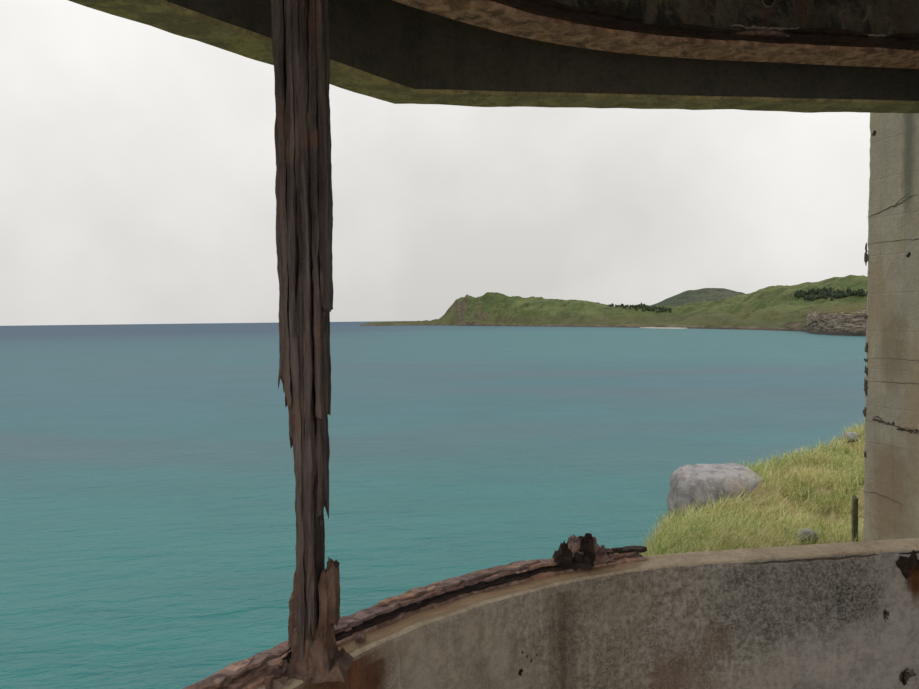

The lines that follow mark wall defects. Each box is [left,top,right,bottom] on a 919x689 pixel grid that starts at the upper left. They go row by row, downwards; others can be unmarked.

crack [867,193,918,218]
rust [183,0,647,689]
crack [869,416,919,434]
rust [895,550,919,596]